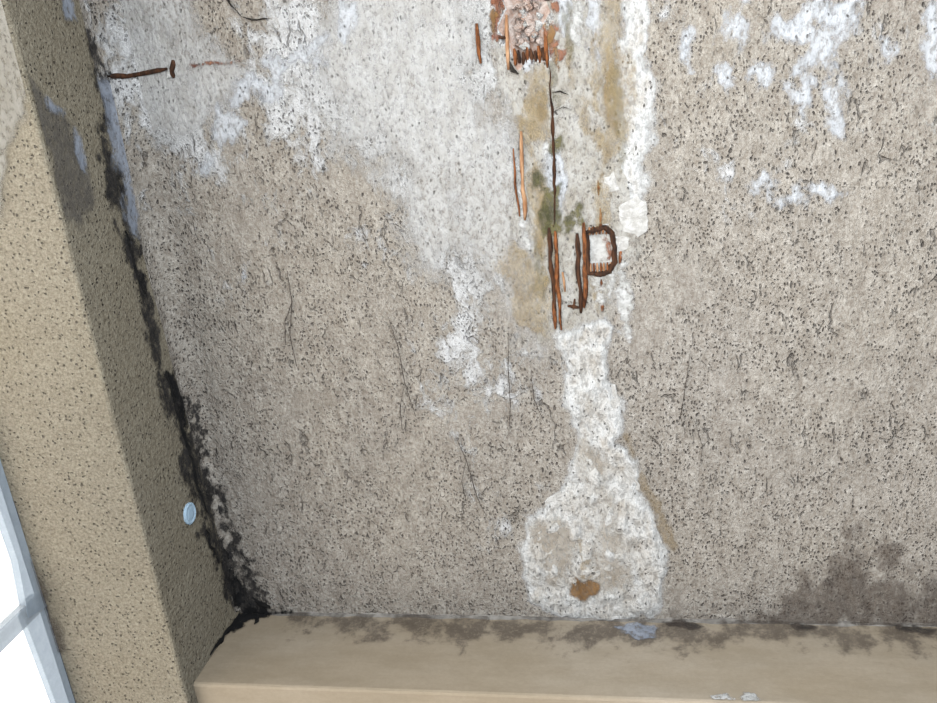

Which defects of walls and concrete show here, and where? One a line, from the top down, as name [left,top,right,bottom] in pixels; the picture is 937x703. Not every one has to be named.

damp [63,0,75,20]
crack [227,0,269,21]
spalling [490,0,567,74]
damp [75,131,87,171]
corrosion [513,131,527,220]
damp [86,29,269,612]
damp [318,0,667,621]
corrosion [547,222,588,330]
damp [896,625,937,634]
peeling [711,692,759,701]